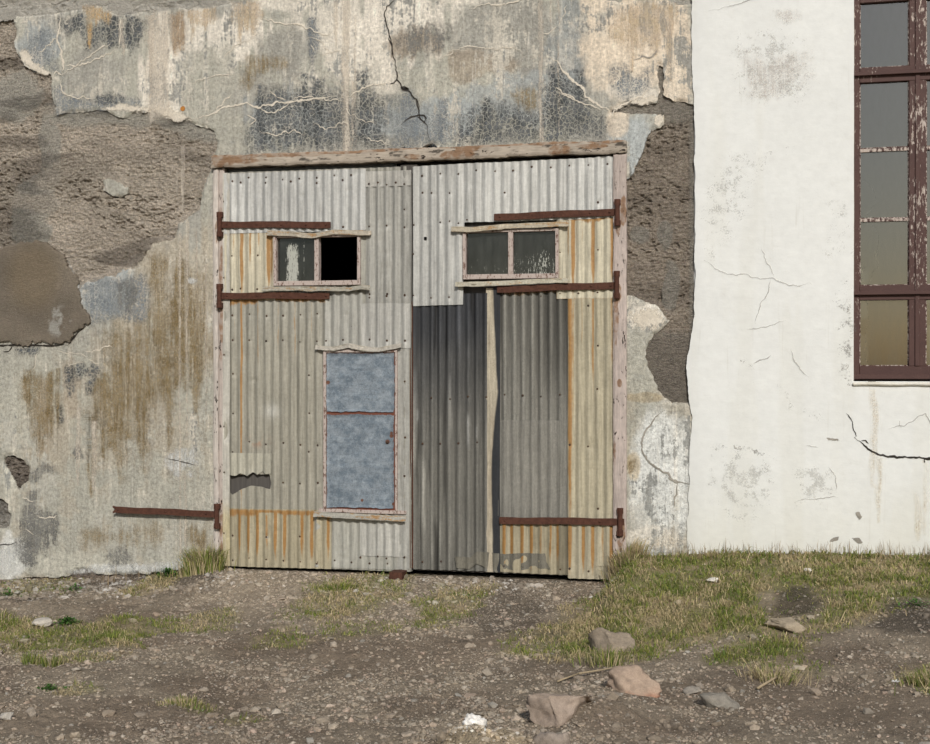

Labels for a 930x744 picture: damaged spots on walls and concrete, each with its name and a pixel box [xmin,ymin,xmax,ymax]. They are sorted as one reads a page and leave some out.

crack [384,1,432,143]
spalling [0,0,249,288]
spalling [612,66,694,403]
crack [704,251,805,329]
water stain [23,234,207,492]
spalling [0,499,11,528]
spalling [5,456,30,488]
crack [641,413,688,506]
crack [846,413,930,463]